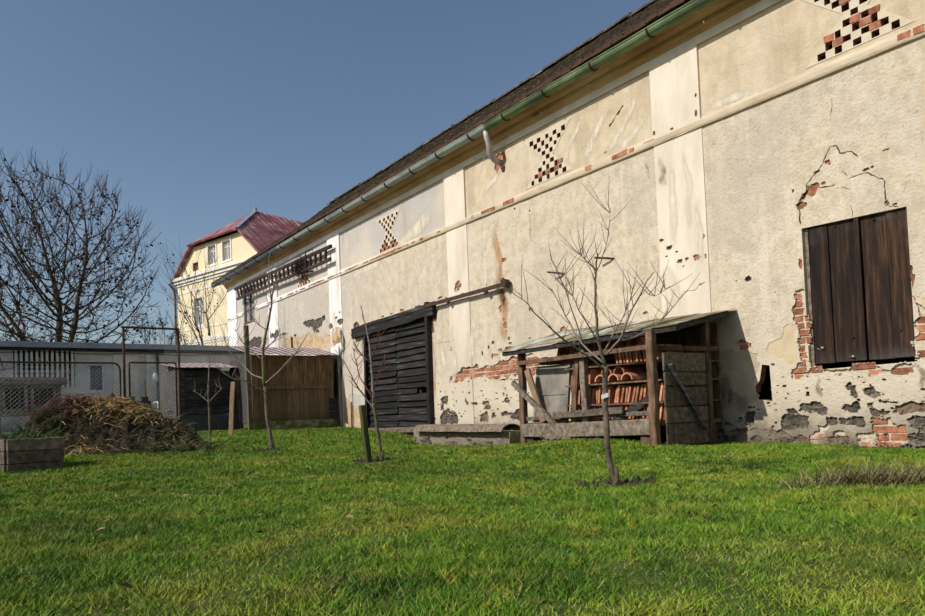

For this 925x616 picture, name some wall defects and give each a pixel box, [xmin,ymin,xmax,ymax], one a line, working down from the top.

crack [797,145,898,225]
corrosion [493,218,509,343]
flaking render [435,305,549,424]
flaking render [717,289,925,449]